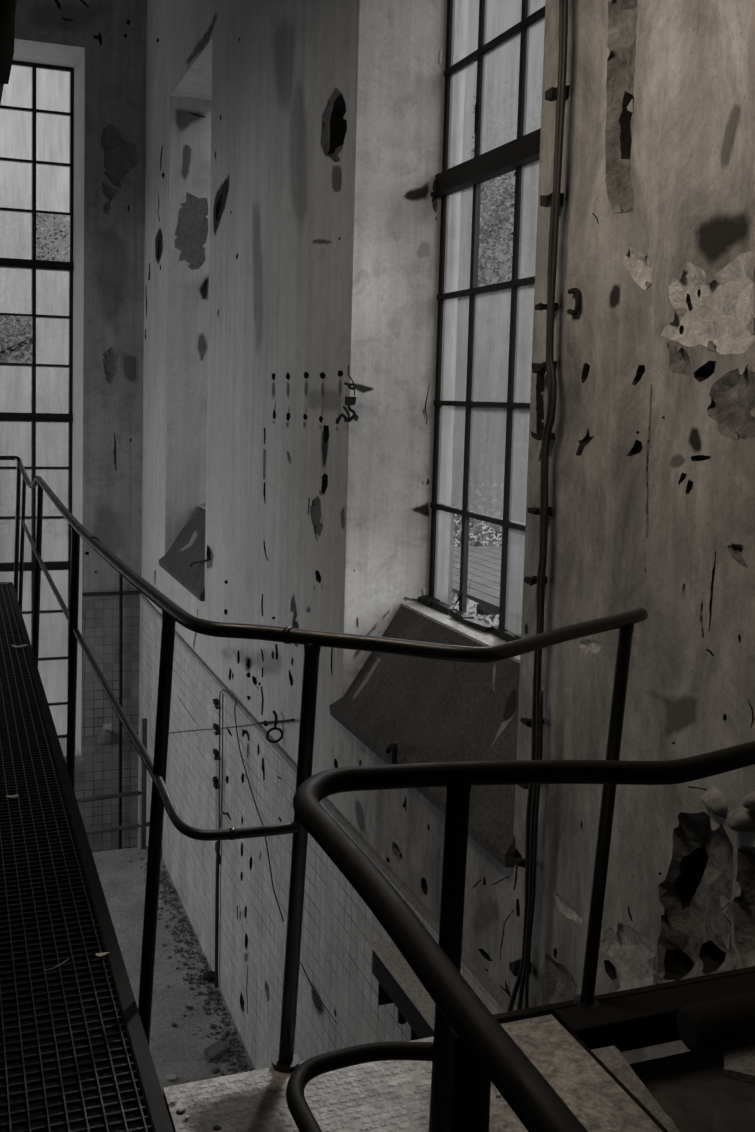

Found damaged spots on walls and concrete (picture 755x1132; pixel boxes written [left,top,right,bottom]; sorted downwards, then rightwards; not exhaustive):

peeling [101,121,137,215]
spalling [320,87,347,192]
spalling [605,0,638,214]
peeling [155,176,231,270]
spalling [624,247,653,291]
peeling [102,347,136,385]
spalling [632,365,645,386]
spalling [661,250,755,440]
spalling [599,812,755,992]